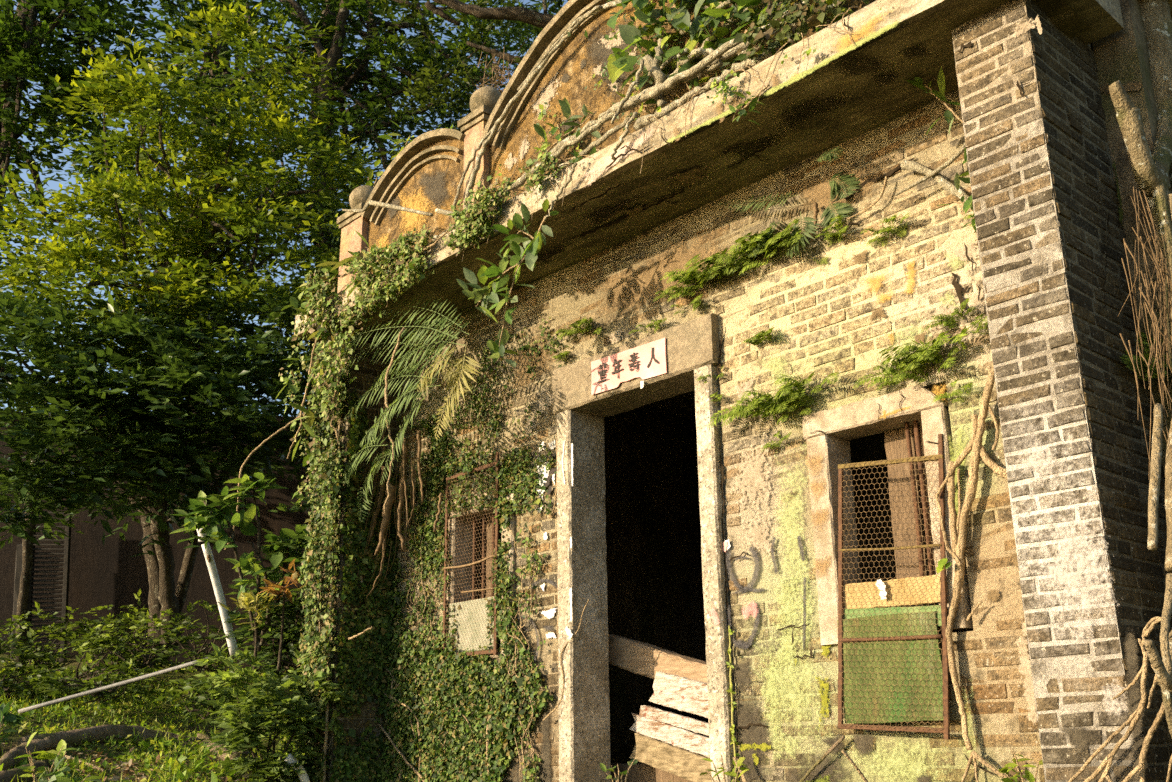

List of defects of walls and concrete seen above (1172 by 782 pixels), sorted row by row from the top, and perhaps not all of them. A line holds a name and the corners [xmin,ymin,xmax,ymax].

damp [580,19,637,93]
damp [666,94,743,142]
damp [387,170,449,232]
damp [585,129,652,184]
damp [786,157,887,214]
damp [581,237,731,313]
damp [505,337,554,385]
damp [776,579,812,667]
damp [733,659,770,782]
damp [785,734,874,782]